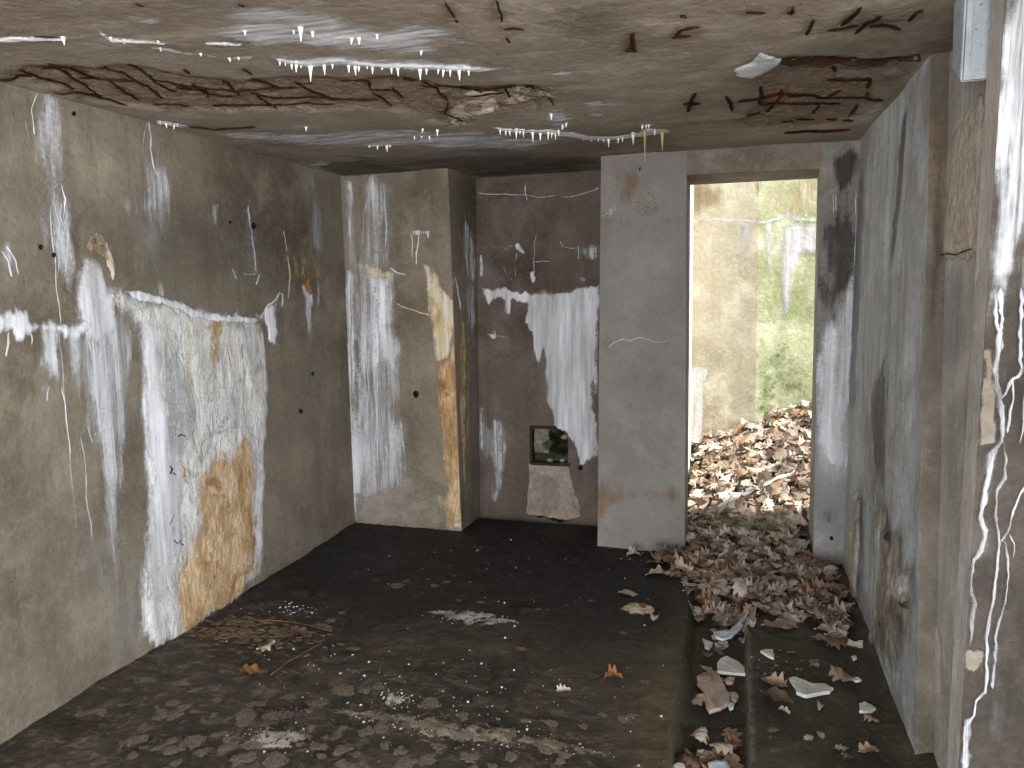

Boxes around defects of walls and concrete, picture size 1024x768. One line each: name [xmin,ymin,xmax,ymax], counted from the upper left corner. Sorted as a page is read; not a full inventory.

leakage [0,36,66,45]
spalling [0,63,558,127]
leakage [100,9,493,82]
spalling [87,233,115,280]
leakage [0,93,283,647]
rust [179,439,257,630]
leakage [229,110,670,527]
rust [437,321,469,528]
peeling [526,429,580,523]
leakage [816,118,912,486]